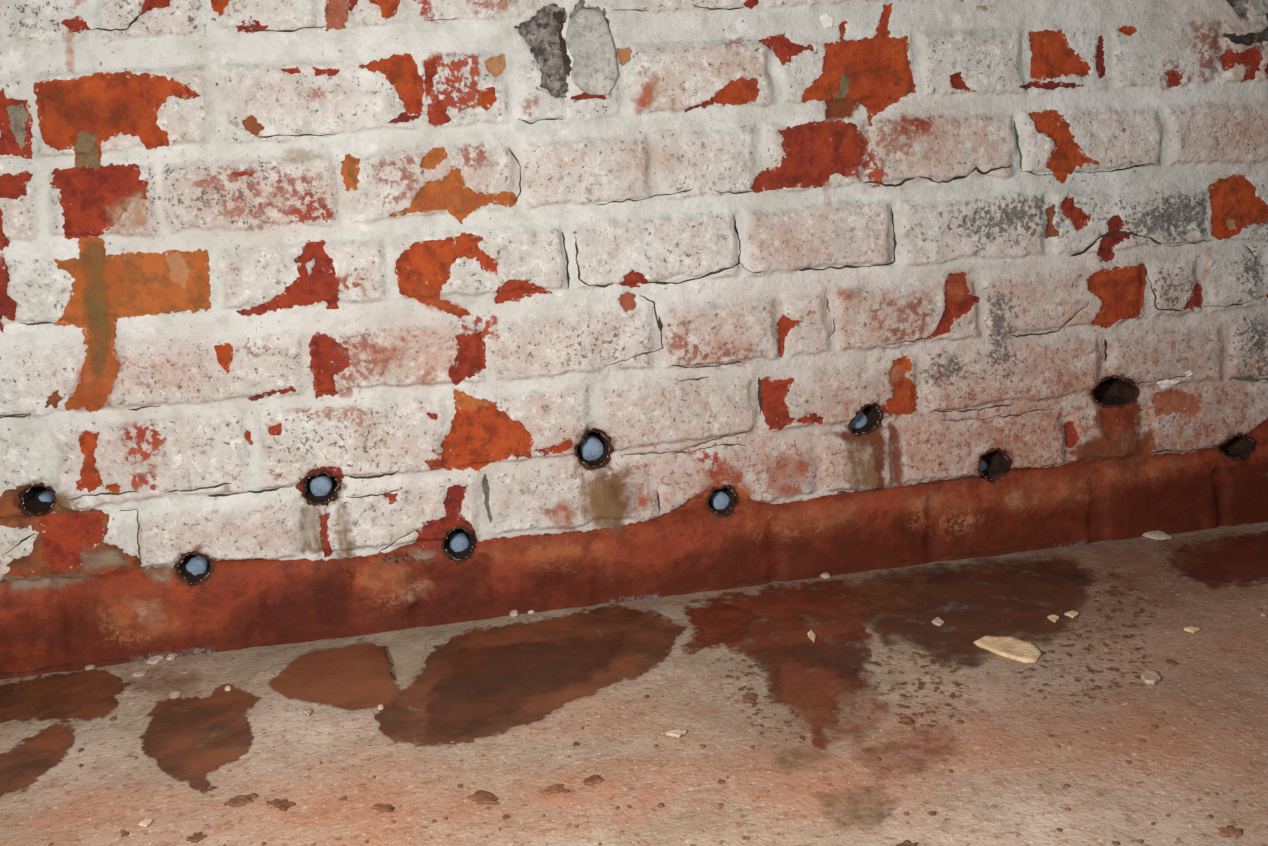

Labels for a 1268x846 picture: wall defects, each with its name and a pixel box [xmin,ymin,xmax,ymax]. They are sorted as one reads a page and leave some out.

peeling [514,0,632,100]
peeling [751,3,933,193]
peeling [1019,29,1106,90]
peeling [0,0,211,412]
crack [796,120,1155,338]
crack [562,189,764,456]
peeling [0,144,1268,680]
crack [938,404,1054,422]
damp [546,469,629,532]
crack [657,493,704,519]
crack [837,476,974,493]
damp [1166,531,1268,588]